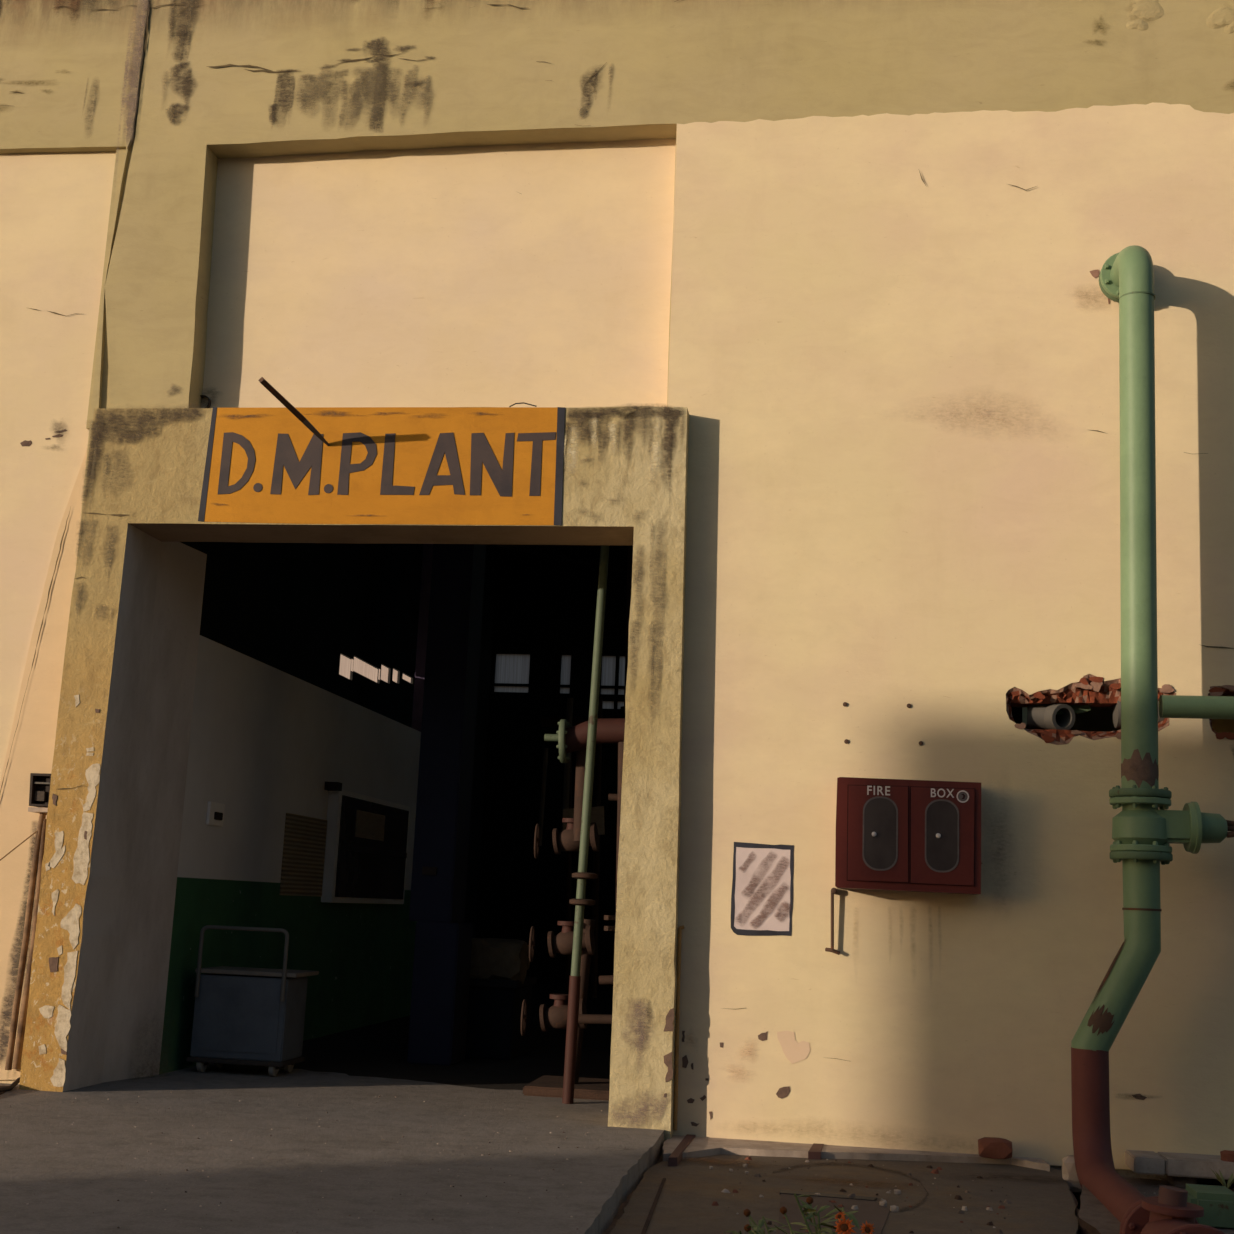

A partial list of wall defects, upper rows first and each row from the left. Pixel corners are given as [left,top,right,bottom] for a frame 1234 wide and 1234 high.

water stain [164,0,198,122]
water stain [269,39,429,129]
water stain [581,67,612,115]
water stain [83,408,201,504]
spalling [1006,674,1121,745]
spalling [1158,684,1176,701]
spalling [1208,685,1234,696]
peeling [45,747,101,885]
peeling [38,889,82,1087]
spalling [664,1008,693,1098]
spalling [776,1086,790,1099]